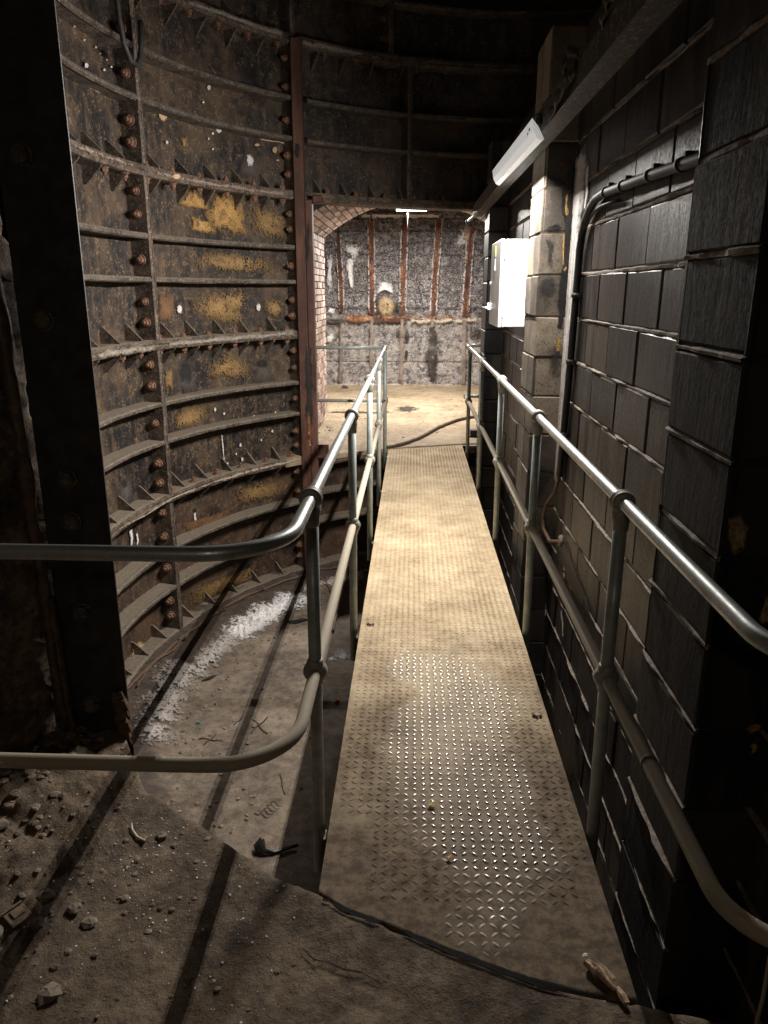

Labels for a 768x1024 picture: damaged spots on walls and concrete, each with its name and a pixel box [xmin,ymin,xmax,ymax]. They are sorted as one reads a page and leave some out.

leakage [345,245,360,287]
rust [326,213,477,384]
rust [305,348,313,446]